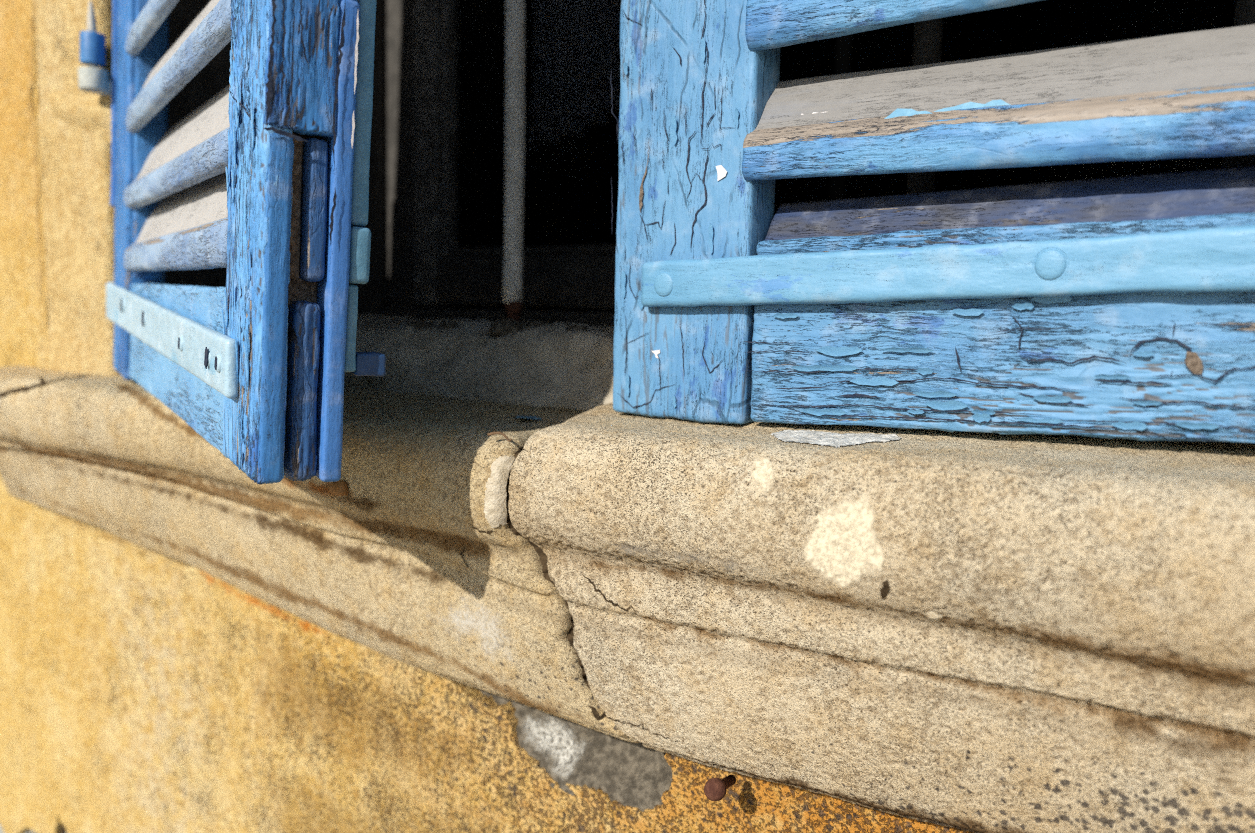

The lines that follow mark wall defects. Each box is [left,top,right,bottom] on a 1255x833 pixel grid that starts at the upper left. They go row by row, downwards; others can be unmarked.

crack [0,375,86,397]
water stain [260,518,322,544]
crack [460,445,678,742]
spalling [474,687,673,812]
water stain [739,770,926,820]